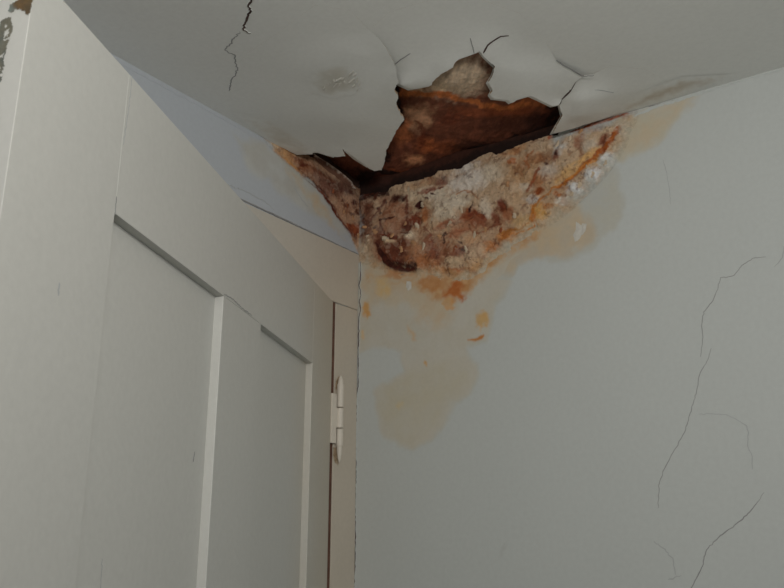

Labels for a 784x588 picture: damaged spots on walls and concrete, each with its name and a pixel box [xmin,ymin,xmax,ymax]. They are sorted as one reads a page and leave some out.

peeling [0,0,33,82]
crack [225,0,253,91]
damp [224,111,558,253]
flaking render [262,53,639,281]
damp [357,74,730,453]
crack [658,248,784,508]
crack [656,494,763,588]